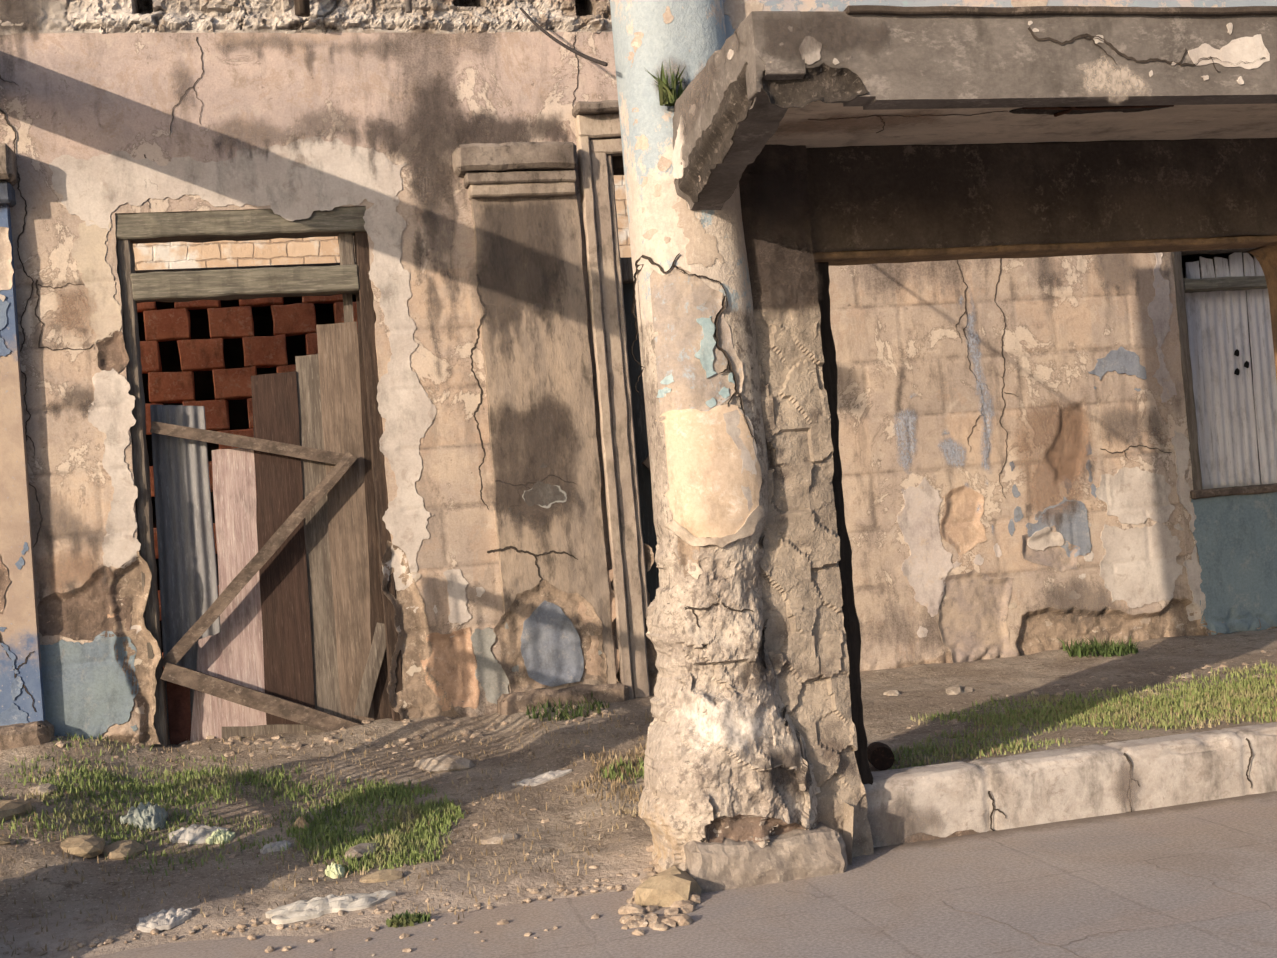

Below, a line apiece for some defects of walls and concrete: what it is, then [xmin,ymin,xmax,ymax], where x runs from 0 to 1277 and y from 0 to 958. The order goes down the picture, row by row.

peeling [1011,0,1048,32]
crack [1028,27,1265,72]
water stain [220,78,565,264]
spalling [0,227,14,357]
crack [0,75,94,548]
water stain [473,203,560,352]
crack [631,254,757,444]
crack [956,258,1019,498]
crack [487,546,578,587]
water stain [490,397,583,547]
peeling [917,431,1277,663]
spalling [705,814,818,843]